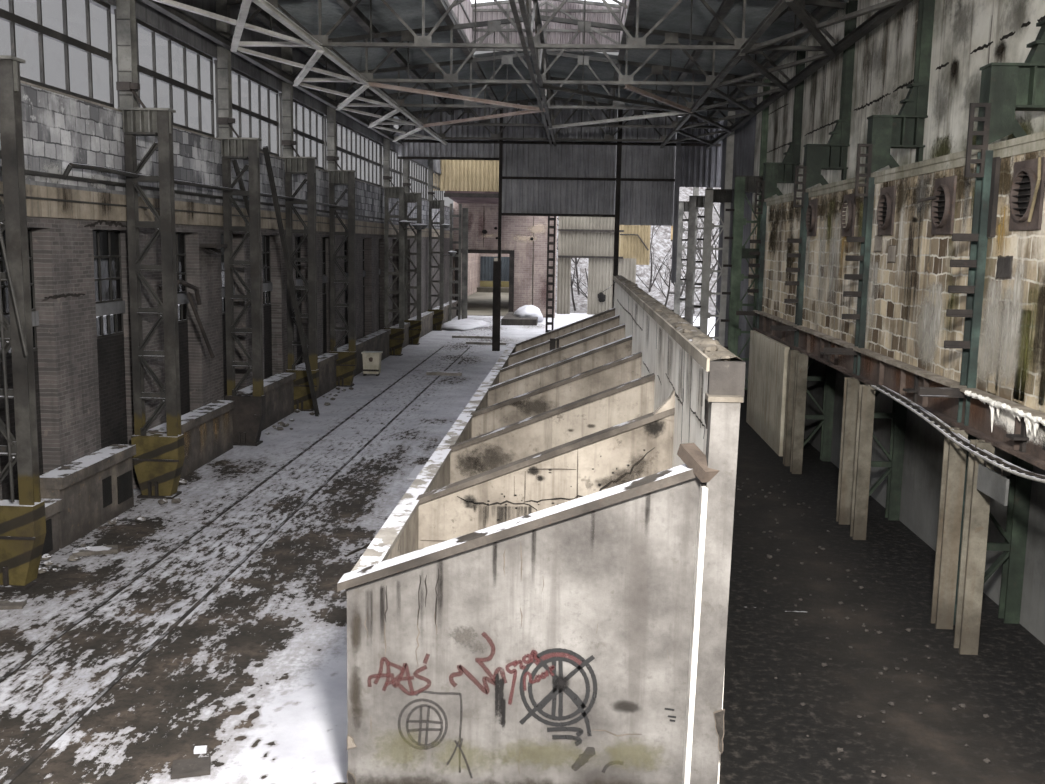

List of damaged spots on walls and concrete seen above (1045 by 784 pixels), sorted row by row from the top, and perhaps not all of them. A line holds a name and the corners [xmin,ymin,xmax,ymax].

water stain [768,201,841,294]
water stain [987,265,1045,373]
crack [617,295,705,442]
crack [457,447,655,511]
water stain [371,587,384,626]